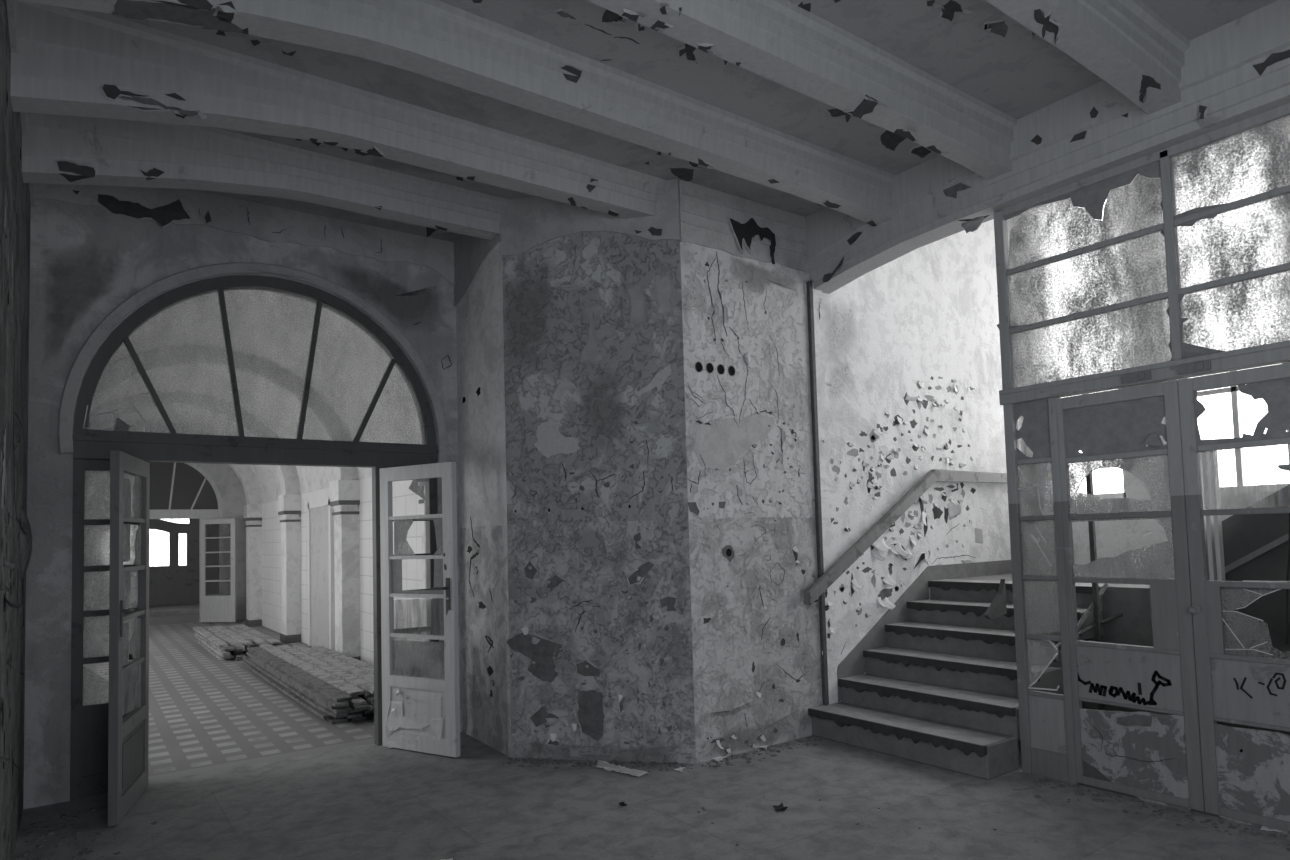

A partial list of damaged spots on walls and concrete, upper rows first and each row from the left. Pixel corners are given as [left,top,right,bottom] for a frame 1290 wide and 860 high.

spalling [1032,9,1062,44]
spalling [1253,49,1290,76]
spalling [99,84,207,119]
spalling [827,94,887,122]
spalling [880,129,950,158]
spalling [96,194,212,228]
spalling [728,217,776,264]
spalling [695,362,735,376]
crack [687,454,710,494]
crack [691,252,809,728]
peeling [813,376,983,655]
peeling [505,625,682,746]